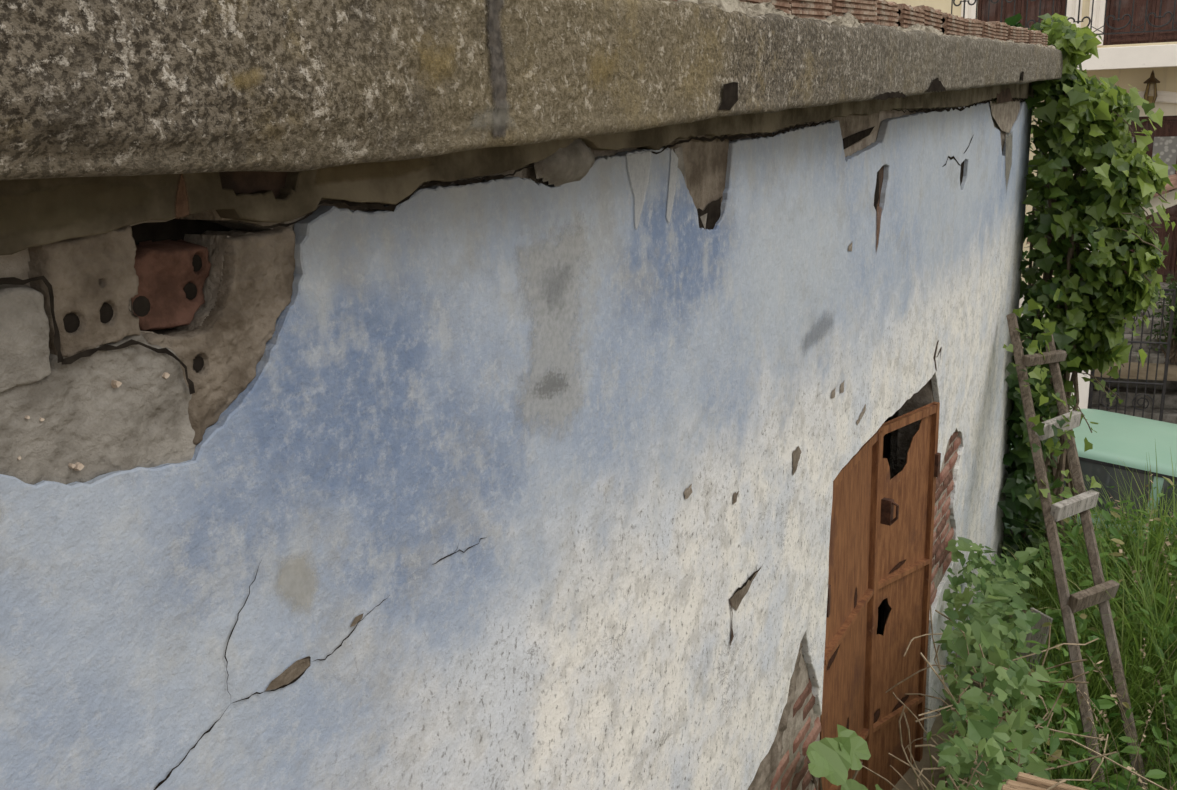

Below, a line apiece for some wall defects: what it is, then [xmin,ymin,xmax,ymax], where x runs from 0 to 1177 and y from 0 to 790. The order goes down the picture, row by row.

spalling [831,91,906,149]
spalling [219,171,288,197]
spalling [665,135,729,230]
spalling [874,166,884,215]
spalling [0,218,295,485]
spalling [793,446,801,475]
crack [432,537,487,565]
spalling [930,432,961,606]
crack [309,595,390,662]
spalling [728,566,762,654]
crack [154,566,265,790]
spalling [747,642,821,790]